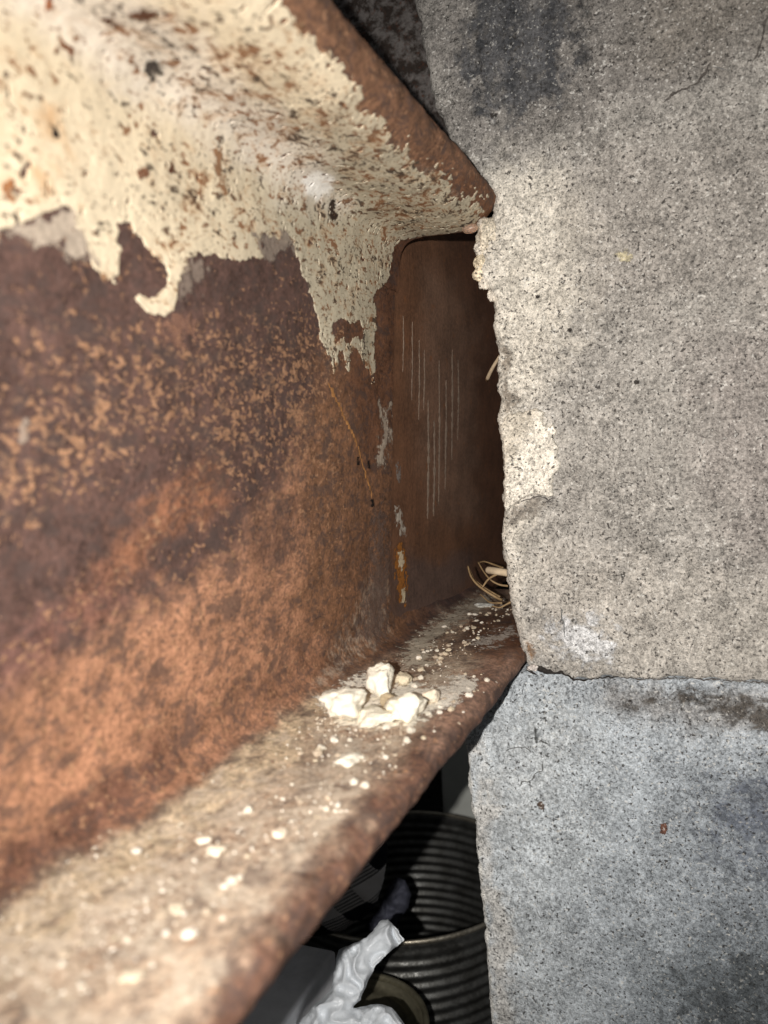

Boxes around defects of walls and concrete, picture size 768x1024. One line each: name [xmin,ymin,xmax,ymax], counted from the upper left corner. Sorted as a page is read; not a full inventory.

peeling [0,0,489,384]
rust [328,383,372,498]
rust [392,542,409,607]